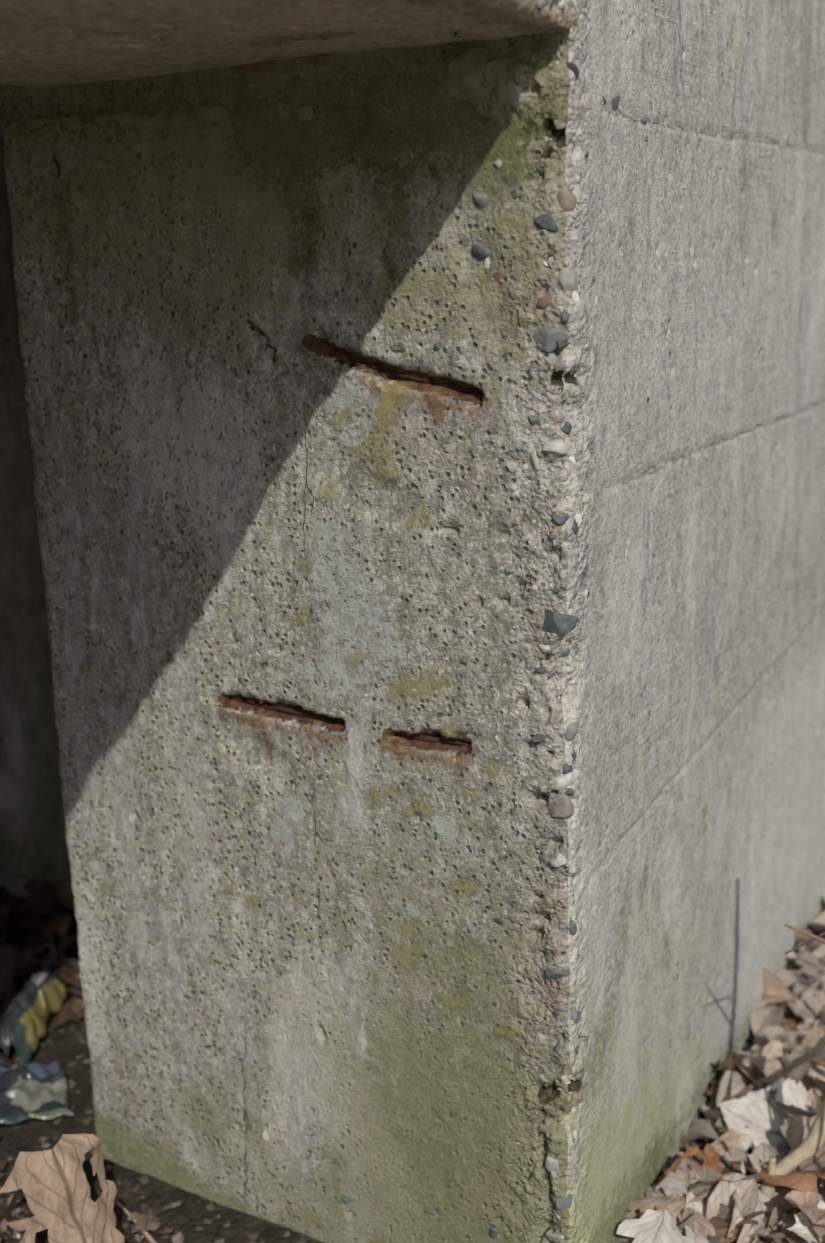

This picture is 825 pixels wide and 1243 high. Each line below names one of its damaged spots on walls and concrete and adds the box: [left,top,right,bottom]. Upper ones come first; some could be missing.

leakage [332,707,368,857]
leakage [343,962,367,1058]